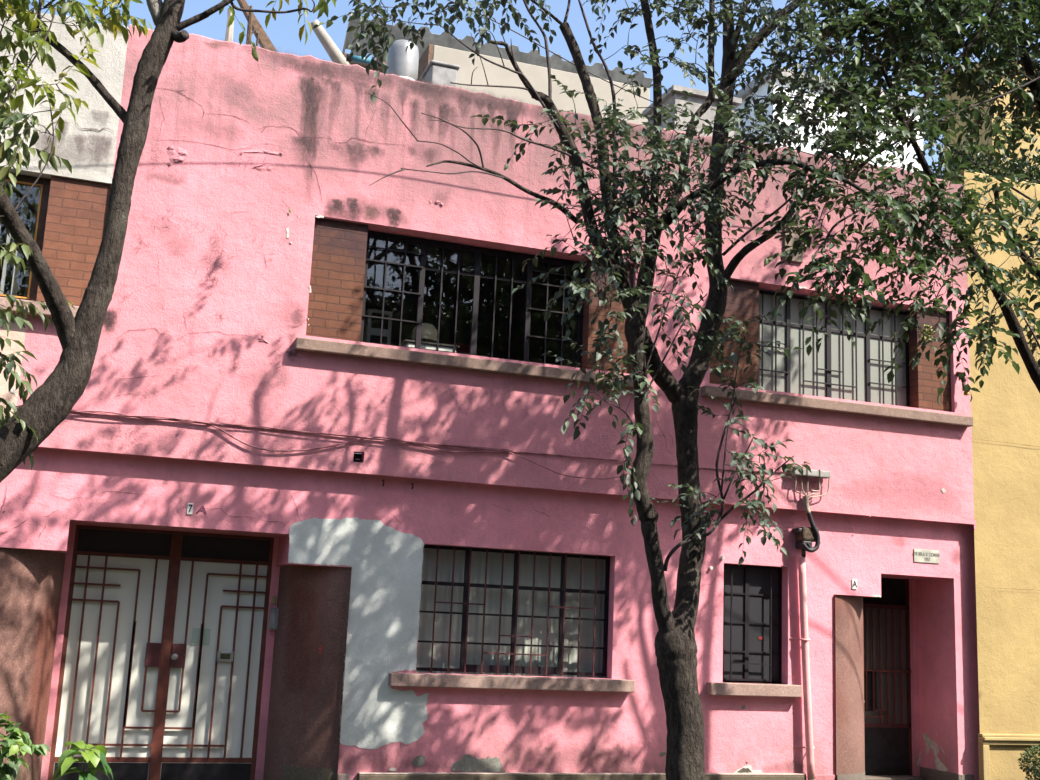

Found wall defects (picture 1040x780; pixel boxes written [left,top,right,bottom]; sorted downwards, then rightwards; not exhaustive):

crack [156,88,396,201]
damp [327,198,375,219]
crack [117,254,260,342]
crack [0,486,145,537]